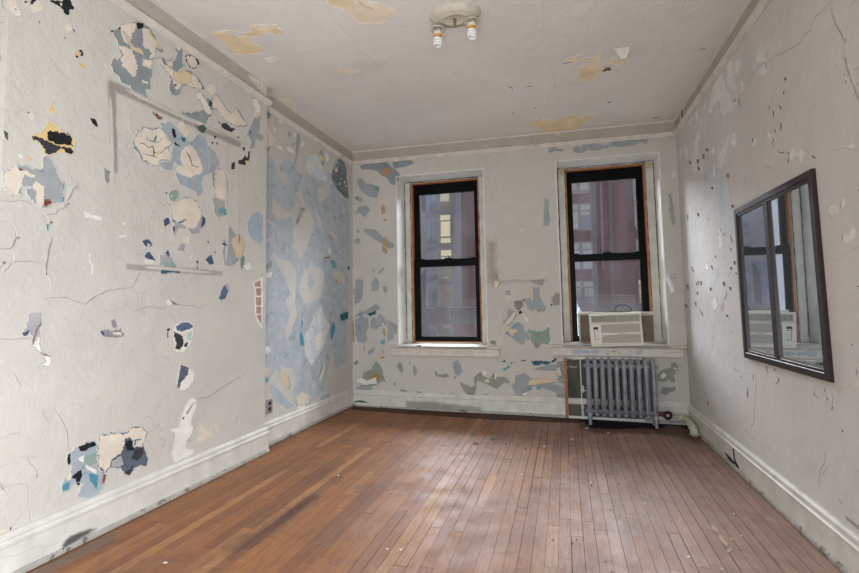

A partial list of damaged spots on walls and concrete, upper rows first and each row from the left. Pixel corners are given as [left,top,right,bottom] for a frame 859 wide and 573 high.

peeling [7,0,76,39]
peeling [74,49,87,70]
crack [831,2,859,99]
peeling [1,100,78,210]
peeling [110,20,417,410]
peeling [547,139,650,154]
peeling [679,57,745,319]
flaking render [23,311,51,368]
peeling [99,319,125,339]
flaking render [167,320,197,464]
peeling [490,281,553,349]
peeling [434,349,654,398]